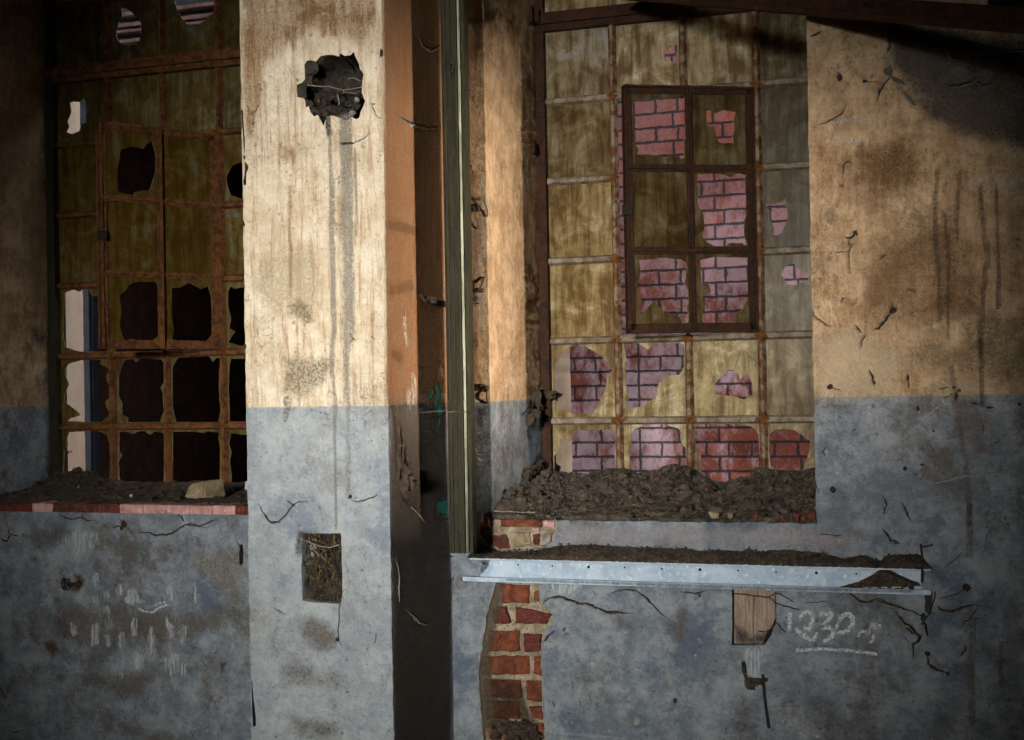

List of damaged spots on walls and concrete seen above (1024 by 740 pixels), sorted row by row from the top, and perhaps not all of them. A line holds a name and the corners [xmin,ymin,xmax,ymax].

hole [297,52,365,126]
water stain [874,198,1001,314]
water stain [284,115,358,526]
crack [0,527,18,544]
crack [60,514,223,538]
crack [258,500,306,524]
spalling [477,510,558,552]
crack [542,589,671,643]
crack [806,553,991,676]
flaking render [477,582,554,740]